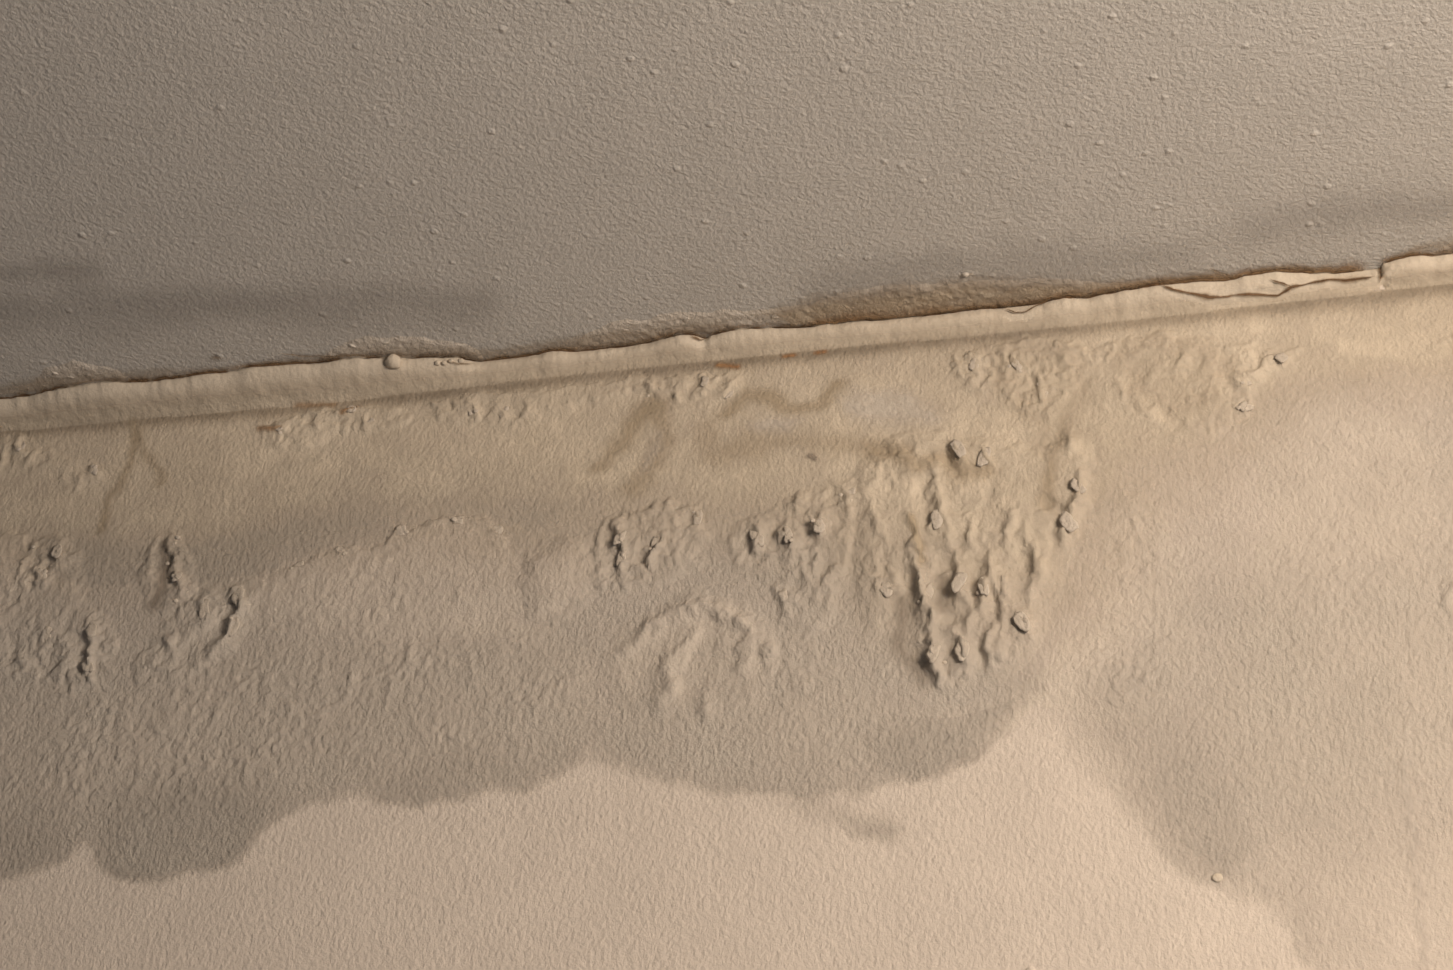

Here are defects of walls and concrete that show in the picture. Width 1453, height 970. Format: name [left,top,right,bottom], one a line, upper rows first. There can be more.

crack [112,253,1453,383]
crack [0,386,67,399]
leakage [0,274,1453,877]